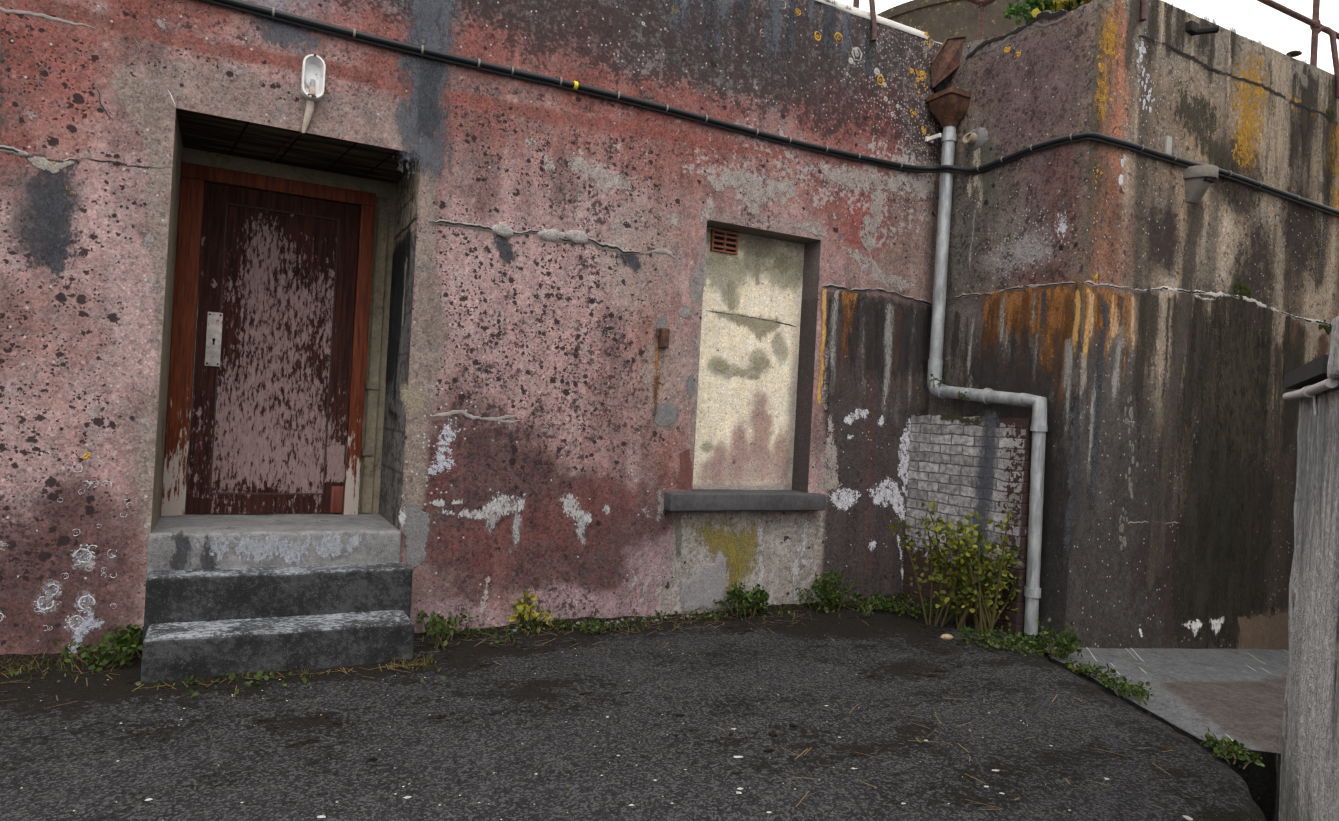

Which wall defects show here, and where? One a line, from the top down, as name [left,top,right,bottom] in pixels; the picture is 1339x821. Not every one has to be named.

crack [0,0,96,29]
crack [0,145,170,169]
water stain [394,0,461,181]
water stain [1125,0,1338,290]
water stain [17,154,84,282]
crack [394,216,678,259]
crack [822,234,1332,327]
corrosion [981,281,1135,401]
water stain [817,294,932,579]
water stain [940,201,1339,649]
peeling [399,491,525,568]
peeling [560,493,610,545]